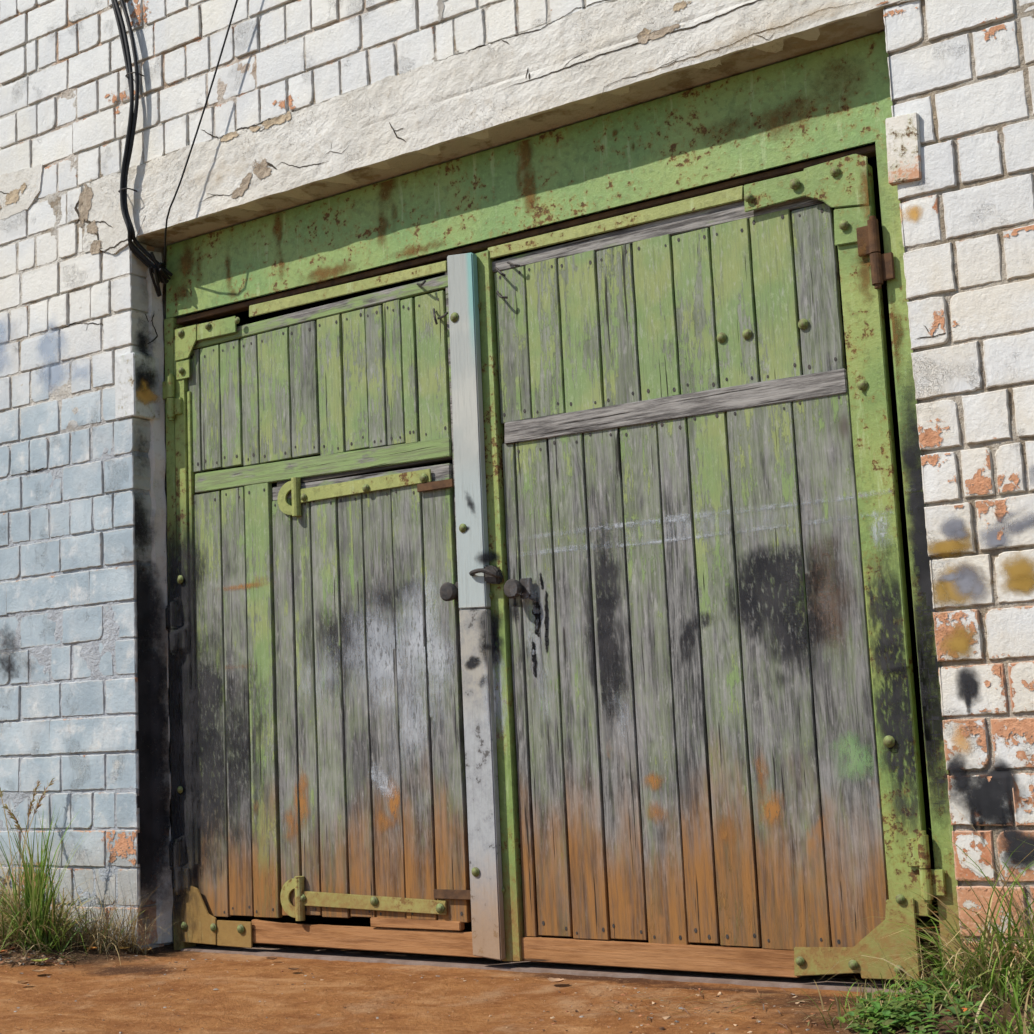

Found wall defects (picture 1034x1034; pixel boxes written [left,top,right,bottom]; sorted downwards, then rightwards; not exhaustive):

crack [437,0,606,61]
crack [503,0,859,103]
spalling [220,94,296,142]
rust [518,139,535,206]
spalling [78,178,102,254]
crack [74,200,128,252]
rust [891,315,903,364]
peeling [918,418,950,468]
leakage [135,497,150,547]
peeling [948,451,1020,540]
peeling [933,611,978,660]
peeling [959,708,1034,781]